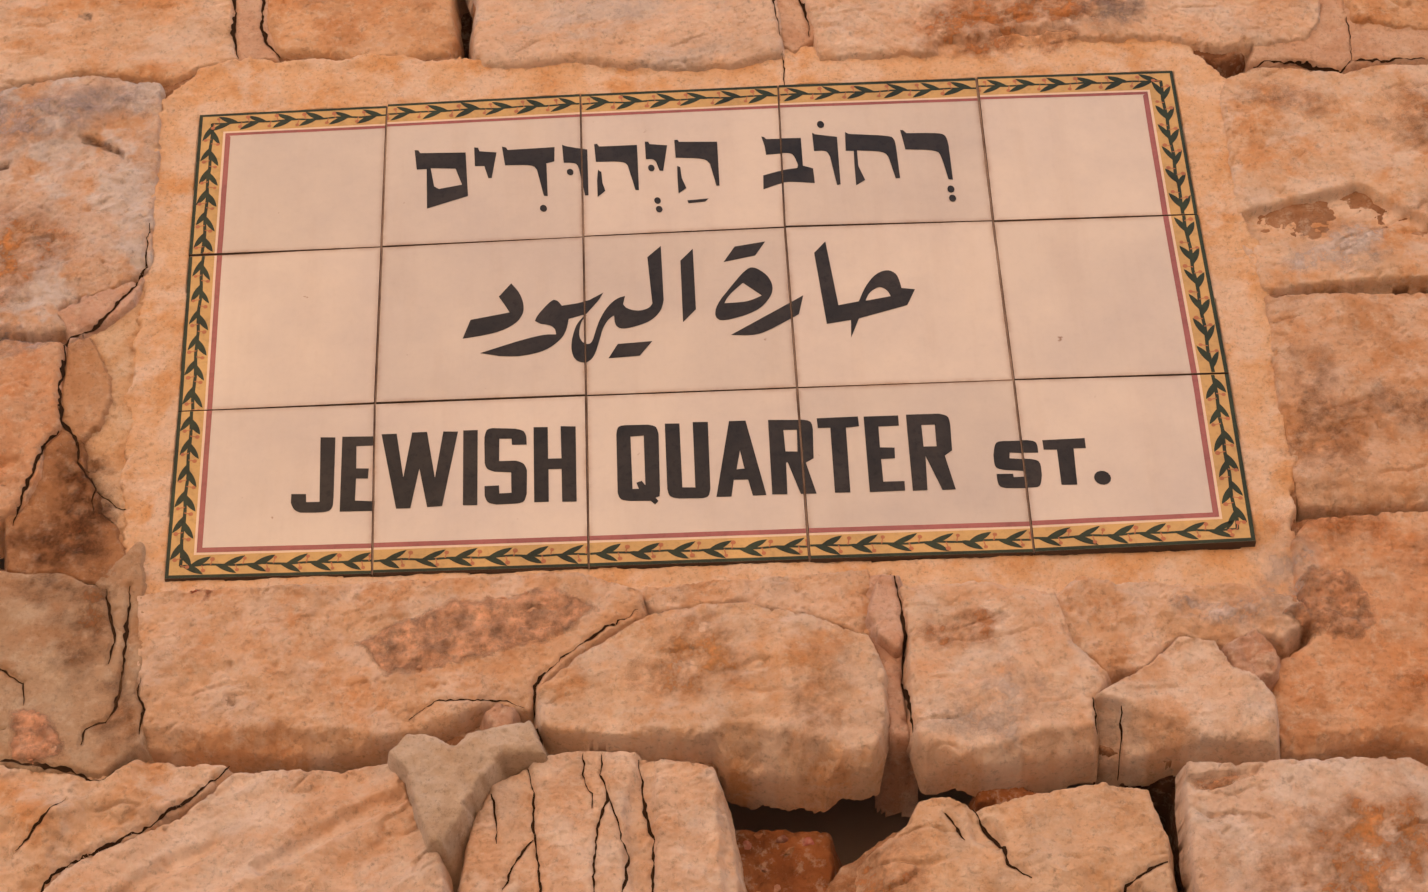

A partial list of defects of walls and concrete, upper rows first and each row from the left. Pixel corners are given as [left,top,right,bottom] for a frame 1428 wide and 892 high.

crack [0,586,146,851]
crack [409,609,638,892]
crack [41,766,230,892]
crack [582,754,655,892]
crack [1124,861,1168,892]